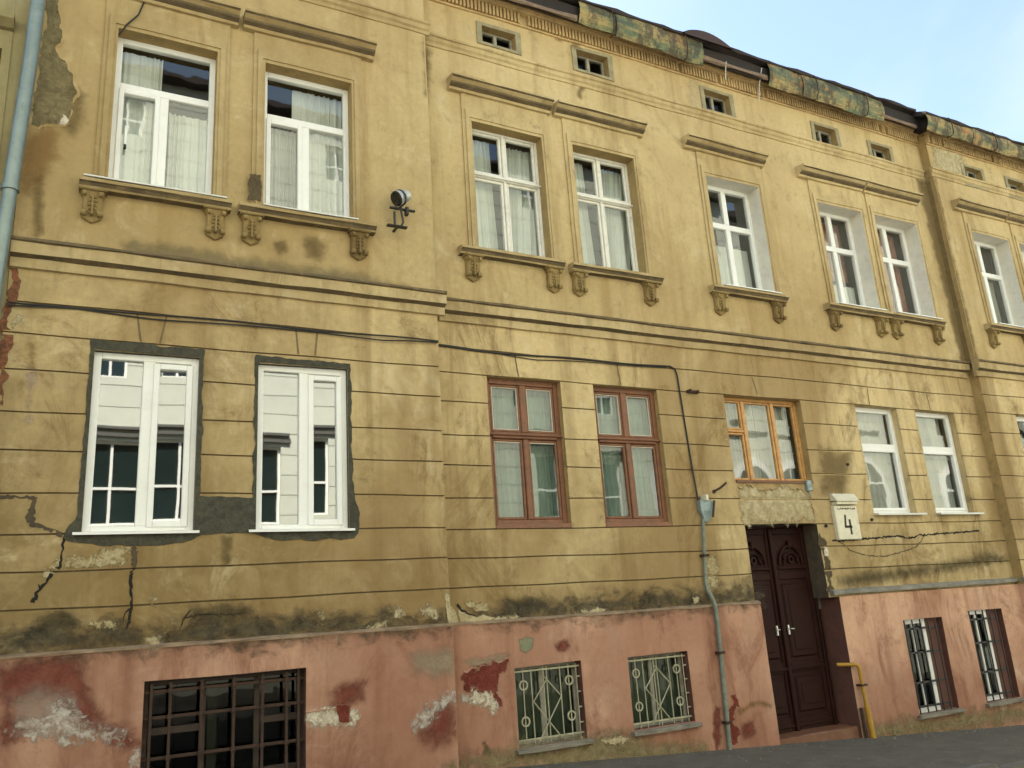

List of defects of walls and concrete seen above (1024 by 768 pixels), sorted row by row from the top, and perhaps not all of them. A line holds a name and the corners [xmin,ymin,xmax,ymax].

spalling [28,0,81,131]
spalling [0,257,23,405]
spalling [738,483,816,526]
crack [0,494,65,603]
crack [123,546,138,630]
leakage [0,603,451,657]
spalling [445,593,495,623]
leakage [478,584,762,627]
peeling [0,654,138,747]
spalling [305,683,363,730]
peeling [461,654,510,715]